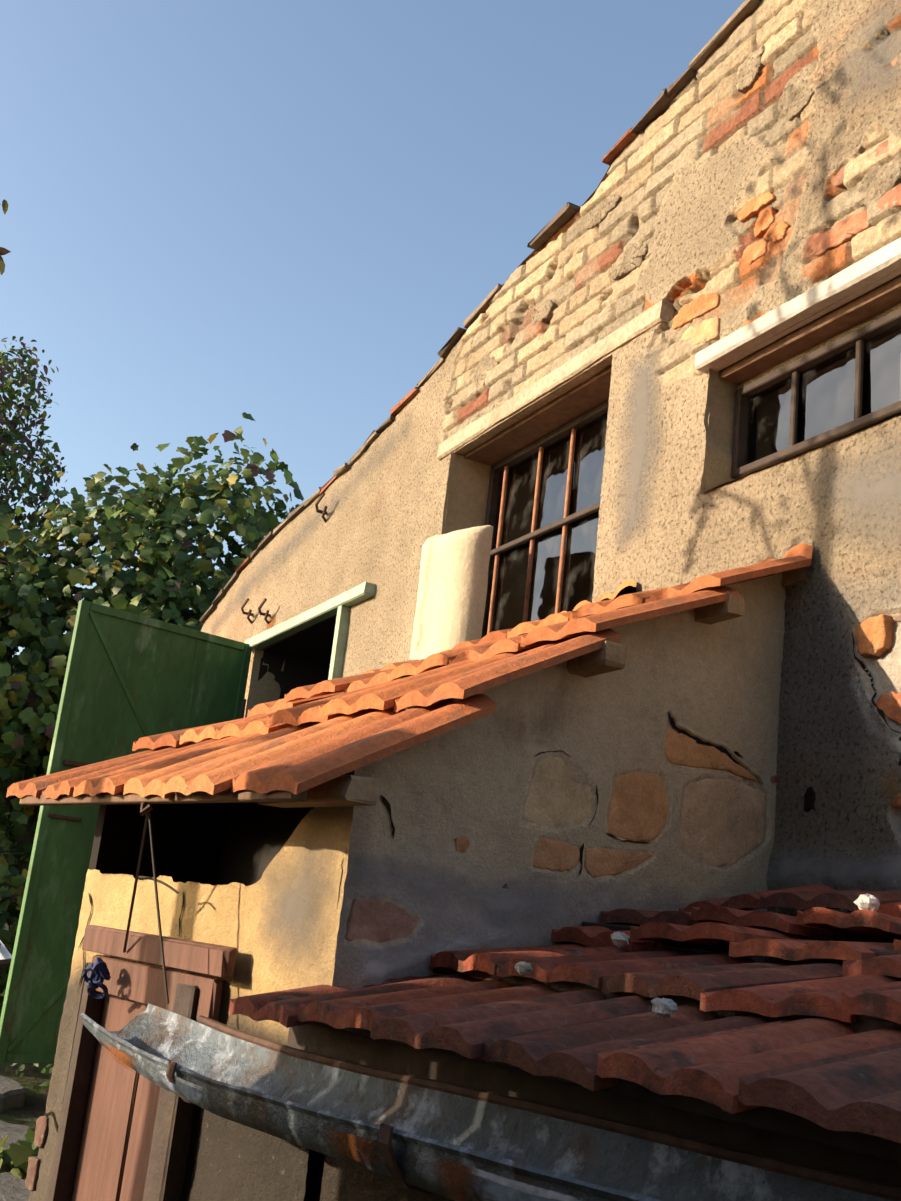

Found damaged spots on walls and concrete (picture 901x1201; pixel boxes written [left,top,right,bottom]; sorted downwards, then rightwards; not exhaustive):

flaking render [735,45,765,94]
flaking render [778,58,819,121]
flaking render [858,154,901,207]
spalling [852,604,901,766]
crack [668,711,764,784]
flaking render [531,719,778,882]
spalling [887,793,901,846]